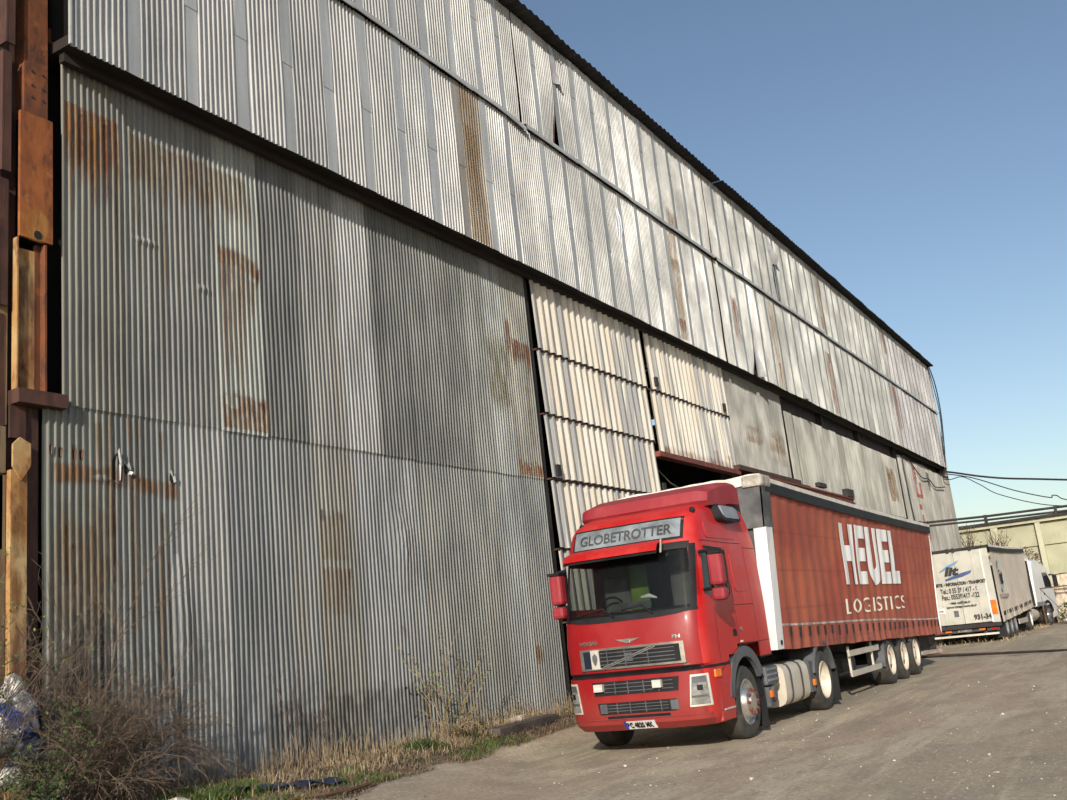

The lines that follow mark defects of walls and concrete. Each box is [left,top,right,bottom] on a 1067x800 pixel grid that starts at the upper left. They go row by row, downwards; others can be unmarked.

rust [64,100,119,199]
rust [27,211,48,240]
rust [18,272,34,323]
rust [224,400,269,433]